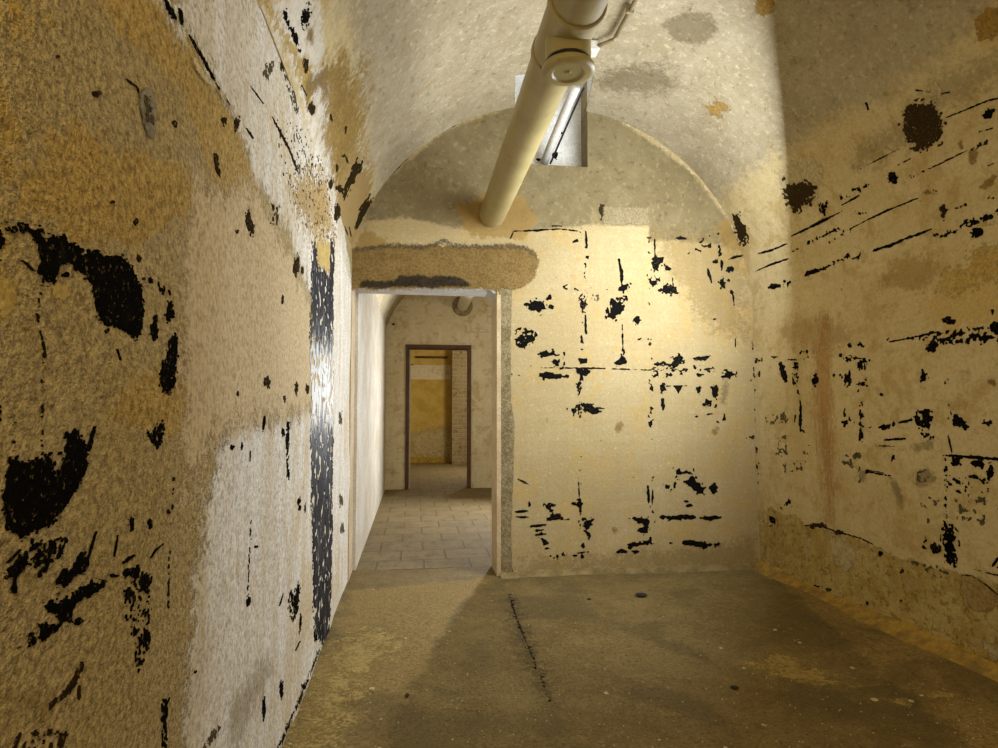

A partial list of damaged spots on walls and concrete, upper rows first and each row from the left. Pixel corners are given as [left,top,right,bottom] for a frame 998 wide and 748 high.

water stain [960,143,978,165]
peeling [0,222,179,399]
peeling [514,258,642,416]
peeling [647,239,679,297]
water stain [755,180,869,272]
water stain [804,252,861,276]
water stain [873,209,998,252]
peeling [648,353,737,427]
water stain [309,236,335,645]
peeling [1,426,153,673]
peeling [616,467,724,554]
crack [508,594,551,702]